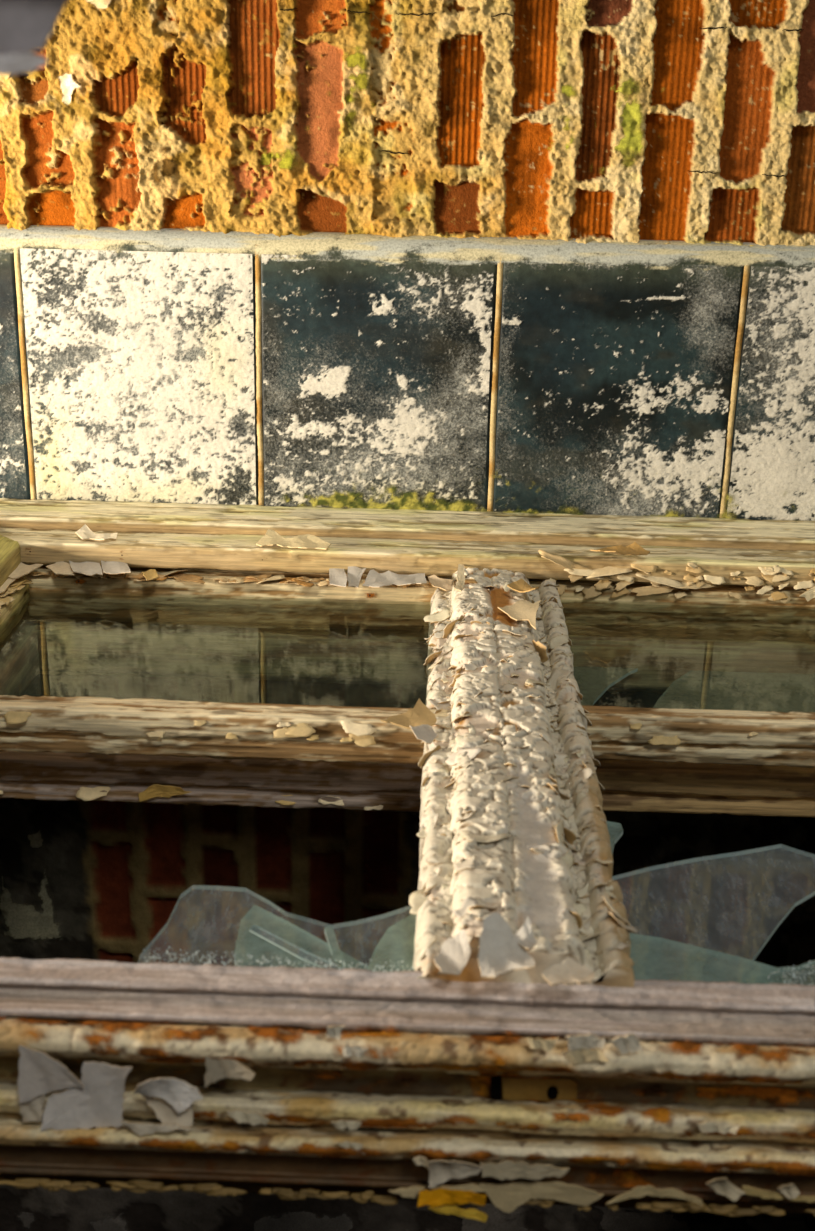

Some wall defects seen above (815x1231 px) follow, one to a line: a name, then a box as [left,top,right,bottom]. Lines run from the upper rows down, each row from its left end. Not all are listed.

leakage [0,224,815,521]
peeling [0,542,815,986]
rust [0,1017,575,1100]
rust [668,1041,815,1061]
peeling [17,1044,255,1136]
rust [67,1137,383,1158]
peeling [227,1109,269,1125]
peeling [0,1155,815,1231]
rust [398,1148,549,1162]
rust [568,1155,815,1187]
peeling [697,1120,740,1134]
rust [625,1071,815,1123]